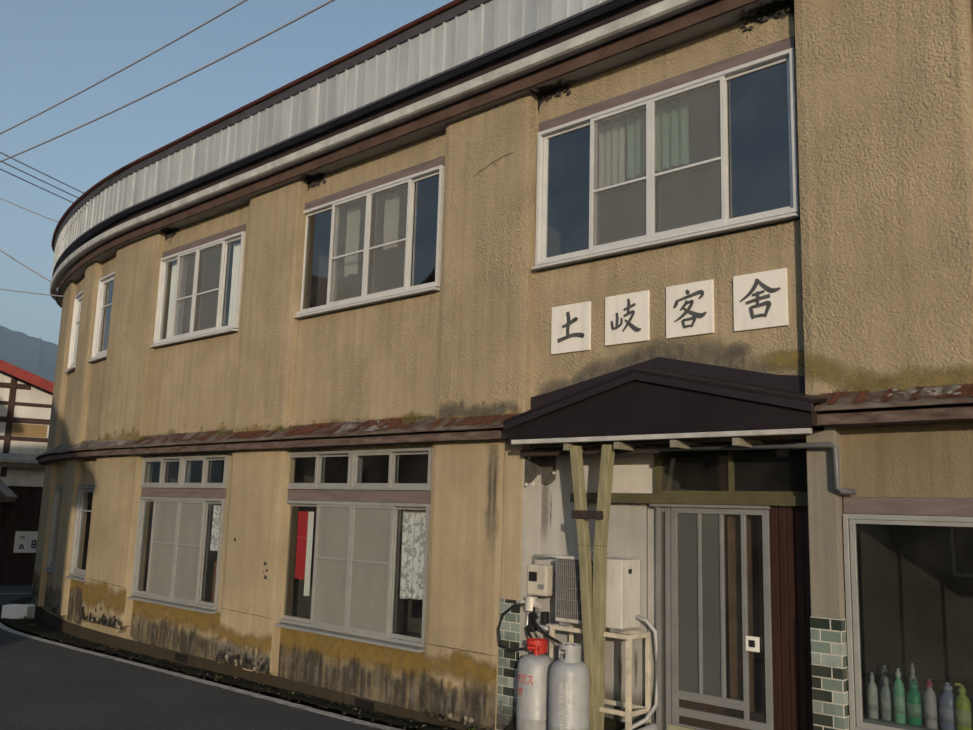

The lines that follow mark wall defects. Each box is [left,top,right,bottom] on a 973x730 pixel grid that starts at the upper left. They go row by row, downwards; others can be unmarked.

water stain [543,345,770,394]
corrosion [827,389,894,405]
corrosion [909,384,973,400]
corrosion [134,416,417,444]
water stain [31,586,115,625]
water stain [130,619,516,730]